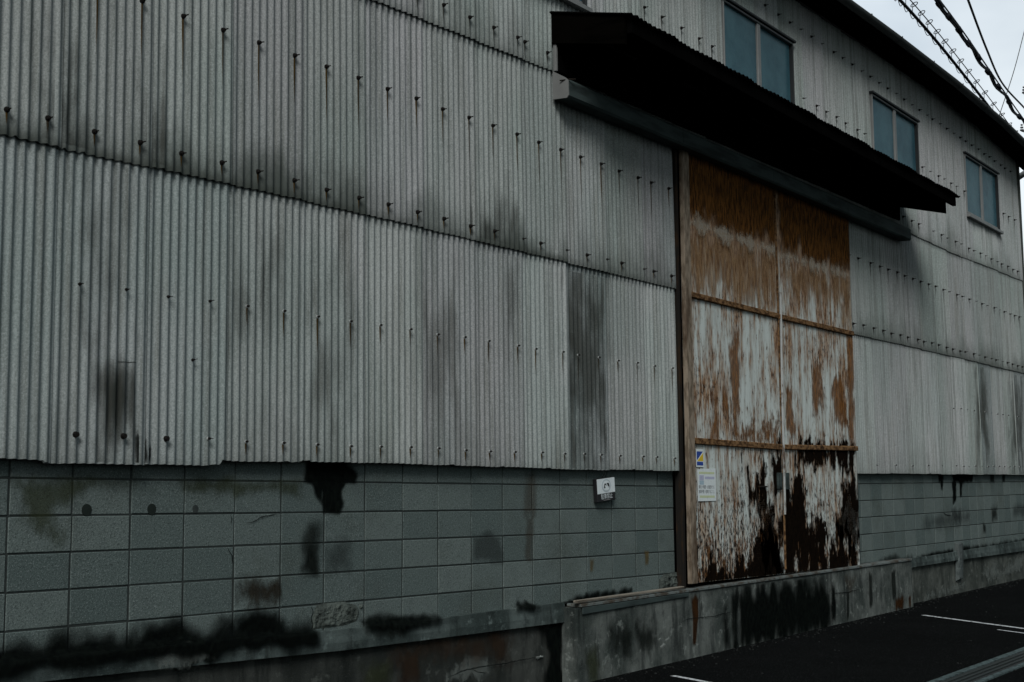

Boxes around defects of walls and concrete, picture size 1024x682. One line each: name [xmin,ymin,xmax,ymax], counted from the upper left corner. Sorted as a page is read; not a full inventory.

corrosion [689,154,850,274]
water stain [569,280,604,408]
water stain [107,378,124,424]
water stain [304,460,357,514]
water stain [938,474,973,504]
water stain [0,581,318,679]
spalling [312,601,364,630]
water stain [725,579,849,648]